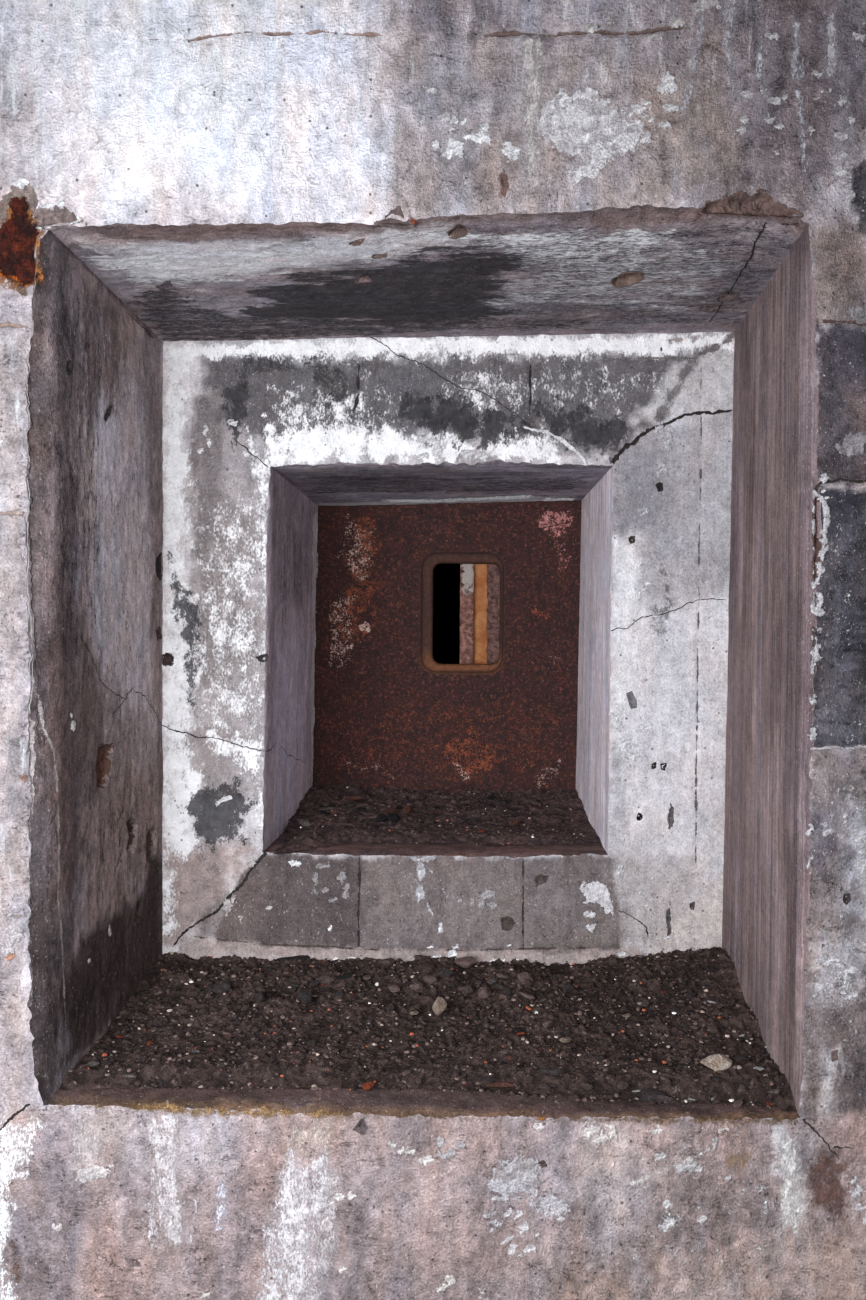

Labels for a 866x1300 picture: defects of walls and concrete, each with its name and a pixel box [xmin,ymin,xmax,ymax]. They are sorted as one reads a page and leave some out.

rust [0,197,45,296]
crack [709,222,799,322]
damp [654,332,735,422]
damp [524,426,587,466]
crack [611,409,733,464]
crack [80,636,305,763]
crack [172,852,267,947]
crack [0,1103,30,1130]